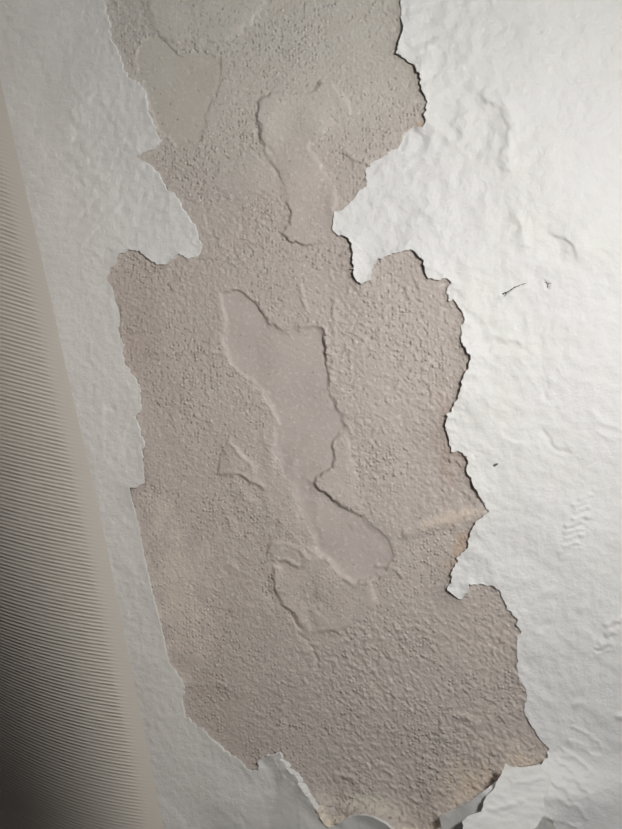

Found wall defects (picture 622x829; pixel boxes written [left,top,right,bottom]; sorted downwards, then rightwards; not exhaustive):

peeling [81,0,559,829]